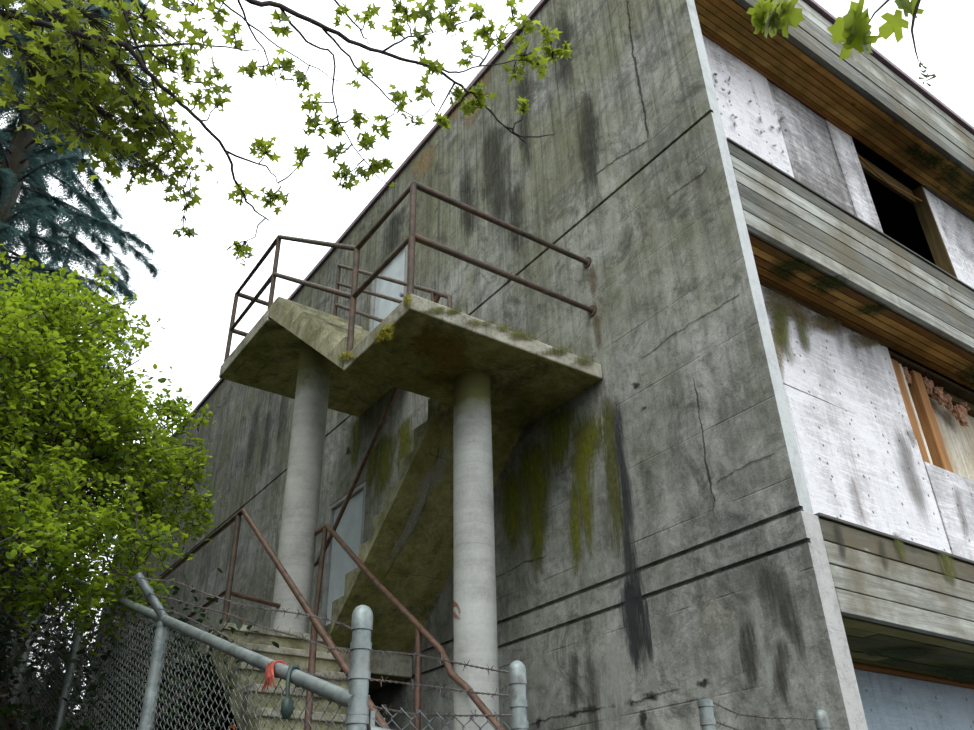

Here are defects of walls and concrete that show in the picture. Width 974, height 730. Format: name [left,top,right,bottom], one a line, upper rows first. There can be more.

crack [595,0,649,175]
water stain [502,411,574,567]
water stain [570,488,581,571]
water stain [588,404,652,730]
crack [693,378,774,518]
water stain [741,568,802,699]